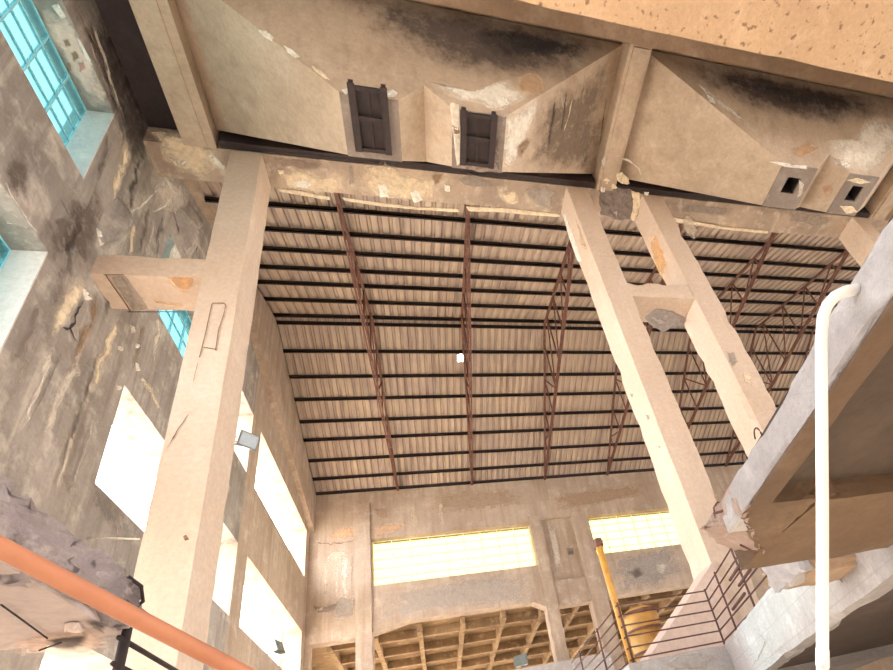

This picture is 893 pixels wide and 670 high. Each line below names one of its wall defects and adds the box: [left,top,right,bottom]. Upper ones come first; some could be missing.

damp [385,7,581,108]
damp [81,17,184,252]
peeling [166,138,225,173]
damp [506,105,535,162]
damp [536,70,604,166]
damp [716,72,868,121]
spalling [599,172,649,221]
crack [63,301,84,343]
spalling [645,309,685,332]
spalling [700,480,816,555]